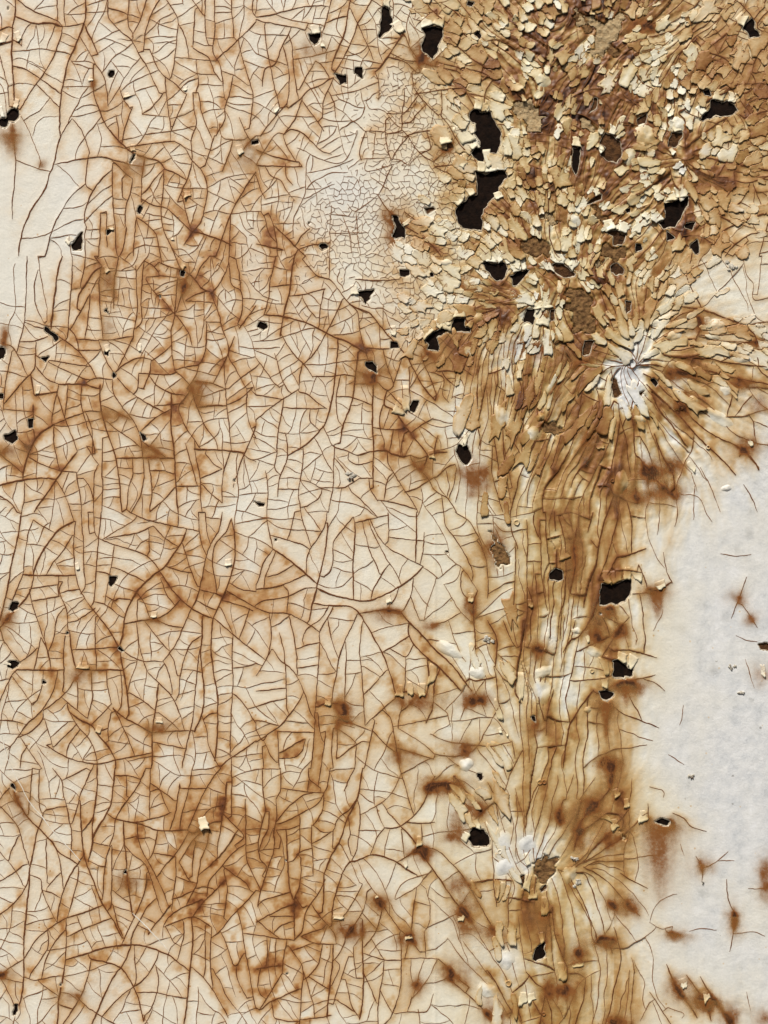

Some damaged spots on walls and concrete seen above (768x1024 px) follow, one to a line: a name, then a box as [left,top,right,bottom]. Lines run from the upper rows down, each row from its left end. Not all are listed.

crack [494,0,768,333]
crack [483,154,571,330]
peeling [377,0,768,526]
corrosion [664,366,706,420]
peeling [599,567,643,615]
crack [724,554,758,686]
peeling [590,651,639,702]
crack [614,694,659,748]
corrosion [422,779,489,842]
peeling [448,727,549,916]
corrosion [534,855,559,884]
corrosion [670,976,739,1024]